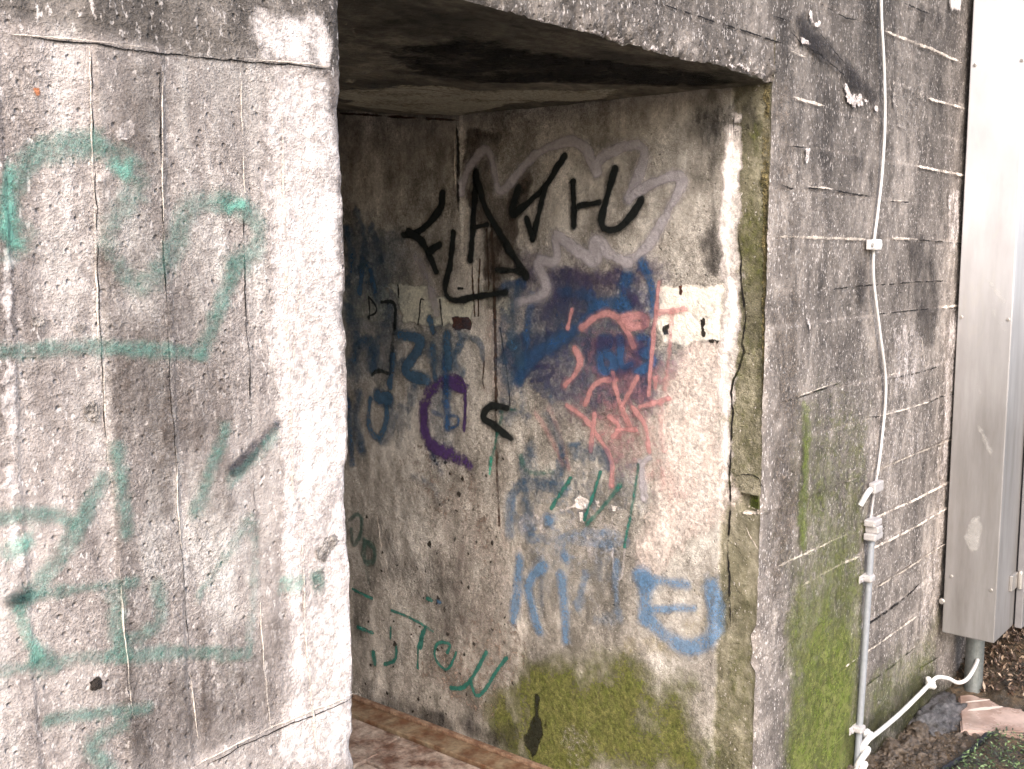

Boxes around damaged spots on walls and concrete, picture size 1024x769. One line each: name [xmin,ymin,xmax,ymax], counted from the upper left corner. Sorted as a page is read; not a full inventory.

damp [797,14,877,99]
crack [4,33,335,648]
damp [255,10,731,769]
damp [636,109,757,573]
crack [727,235,764,626]
crack [119,570,133,713]
damp [863,672,954,756]